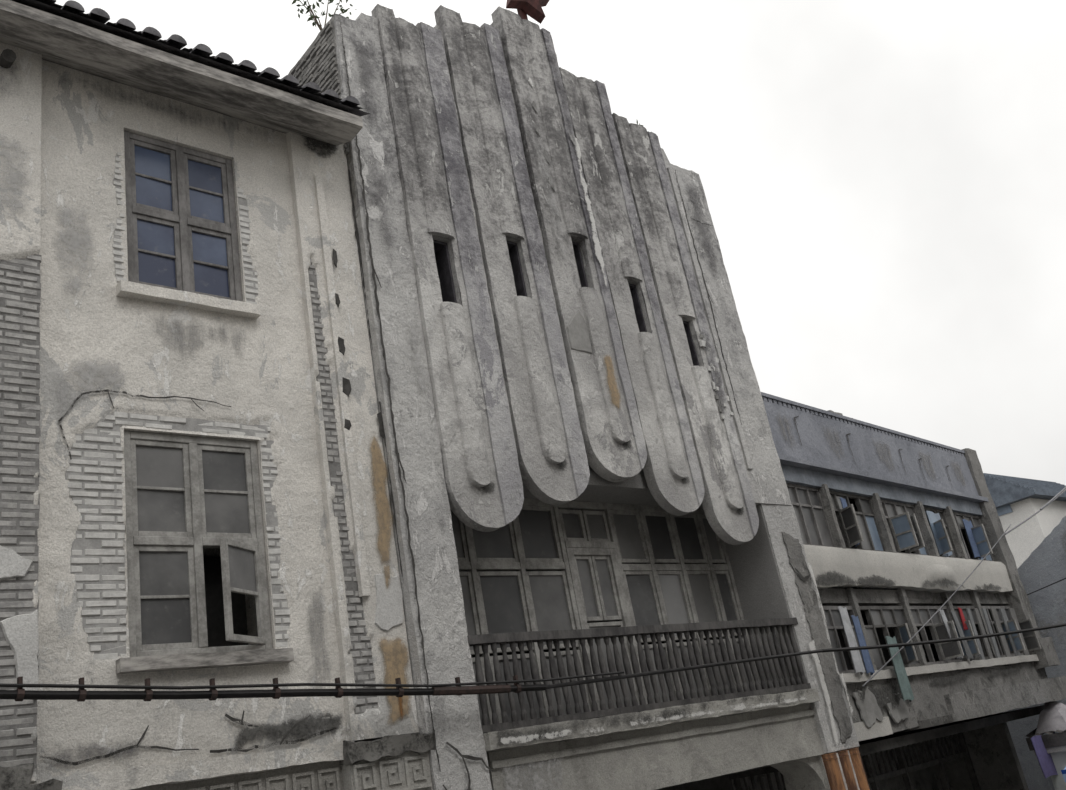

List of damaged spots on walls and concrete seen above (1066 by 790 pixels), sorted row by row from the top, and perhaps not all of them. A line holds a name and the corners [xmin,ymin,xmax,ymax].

flaking render [0,254,41,774]
flaking render [65,412,290,660]
crack [40,710,336,765]
flaking render [308,258,404,714]
spalling [782,532,910,743]